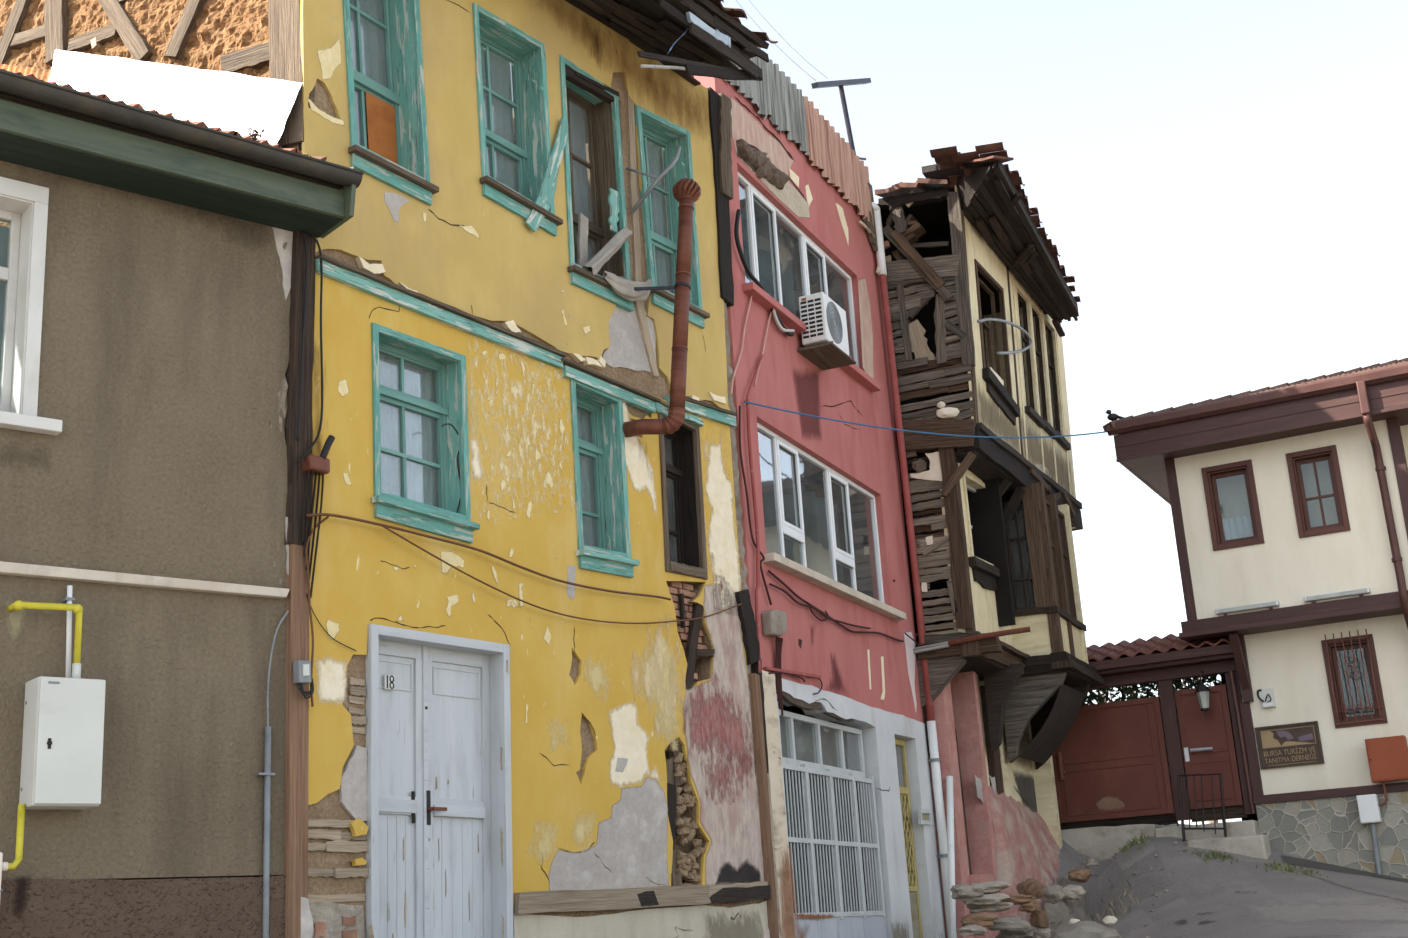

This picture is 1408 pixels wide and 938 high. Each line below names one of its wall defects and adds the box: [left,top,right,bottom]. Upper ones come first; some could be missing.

peeling [318,39,341,80]
peeling [730,98,813,218]
peeling [836,203,849,245]
flaking render [355,257,386,275]
flaking render [501,320,521,333]
flaking render [569,306,657,378]
peeling [468,340,575,525]
peeling [623,402,657,510]
peeling [441,551,464,573]
peeling [317,658,346,703]
peeling [549,434,821,891]
flaking render [782,691,855,722]